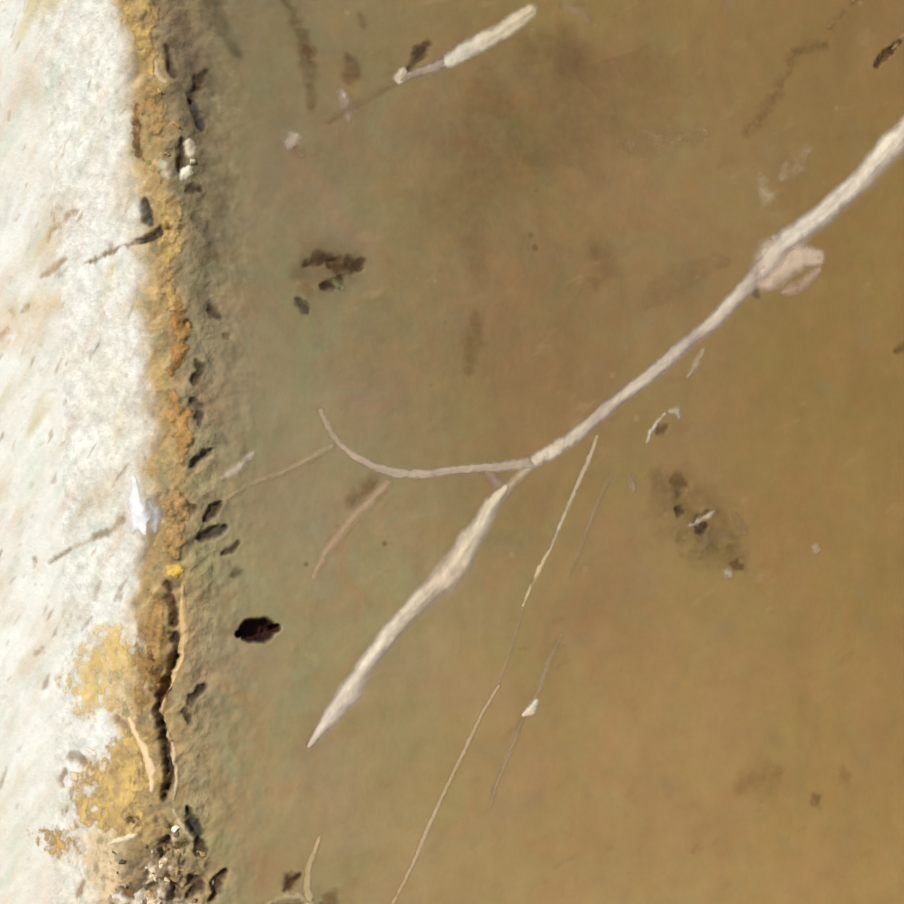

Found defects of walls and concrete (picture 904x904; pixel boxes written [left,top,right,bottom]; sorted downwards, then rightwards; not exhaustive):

crack [394,5,536,84]
crack [874,32,904,67]
crack [221,118,904,748]
crack [117,581,205,801]
spalling [99,806,227,904]
spalling [267,836,322,904]
crack [391,684,500,904]
crack [489,634,562,810]